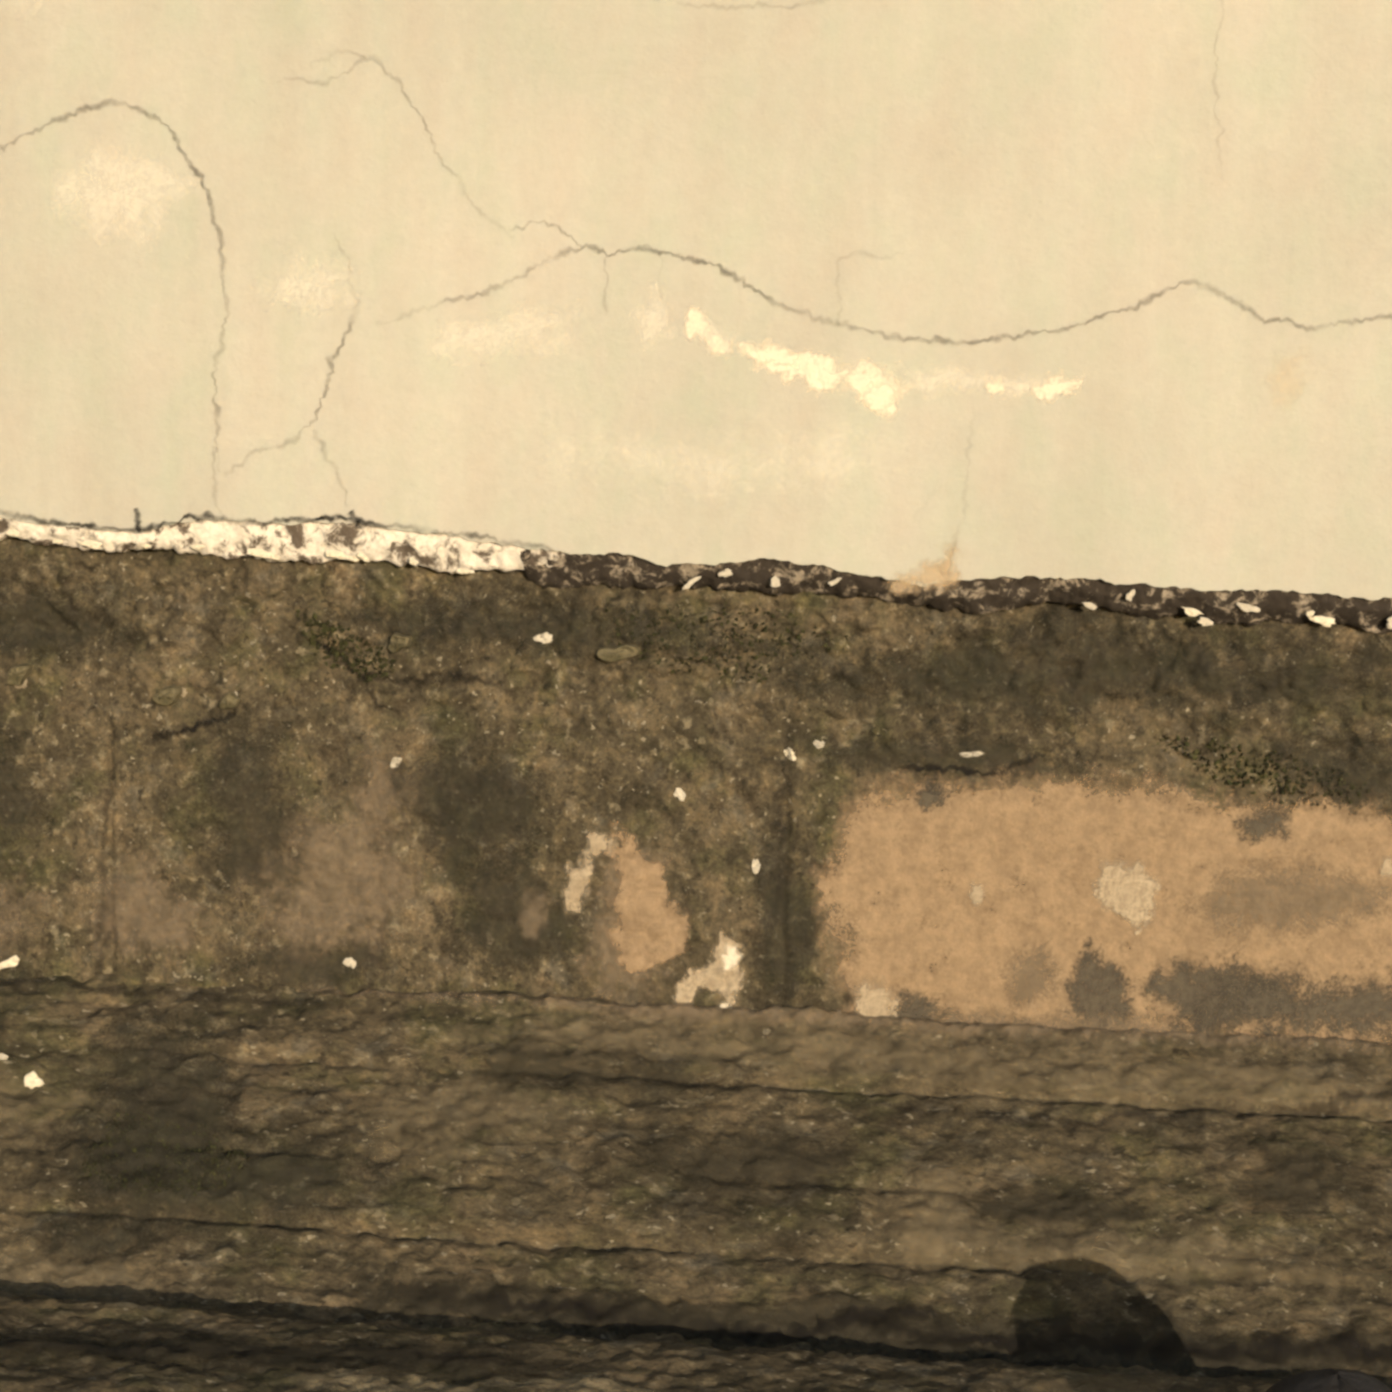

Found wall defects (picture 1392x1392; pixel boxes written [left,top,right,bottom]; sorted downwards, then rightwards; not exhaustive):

crack [34,509,214,532]
crack [258,510,381,528]
flaking render [0,517,1392,635]
peeling [519,895,547,938]
peeling [564,822,690,974]